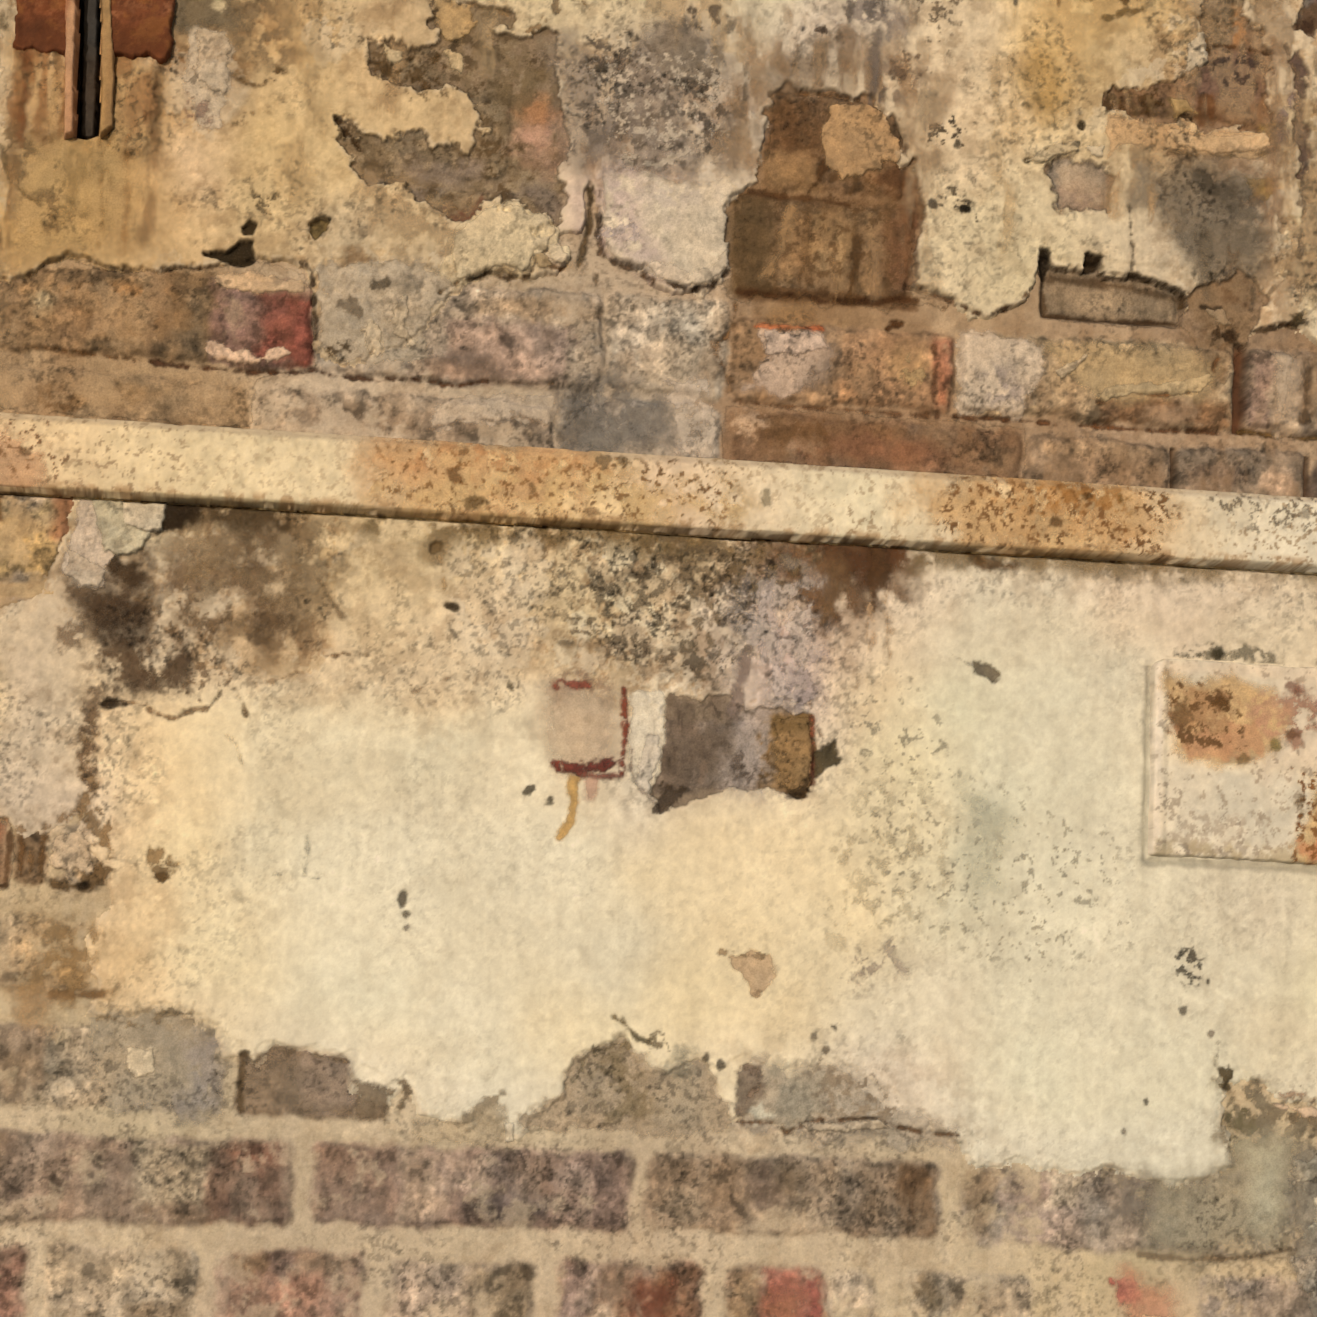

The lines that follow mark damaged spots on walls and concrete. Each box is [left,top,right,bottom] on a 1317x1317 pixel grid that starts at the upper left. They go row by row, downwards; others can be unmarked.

spalling [0,0,570,431]
spalling [723,81,948,314]
spalling [1024,0,1275,213]
spalling [667,249,1269,478]
peeling [62,499,166,587]
leakage [58,502,344,787]
leakage [366,517,388,534]
leakage [435,523,1228,718]
spalling [628,690,842,814]
peeling [17,924,412,1124]
peeling [414,1015,959,1151]
peeling [1218,1067,1317,1155]